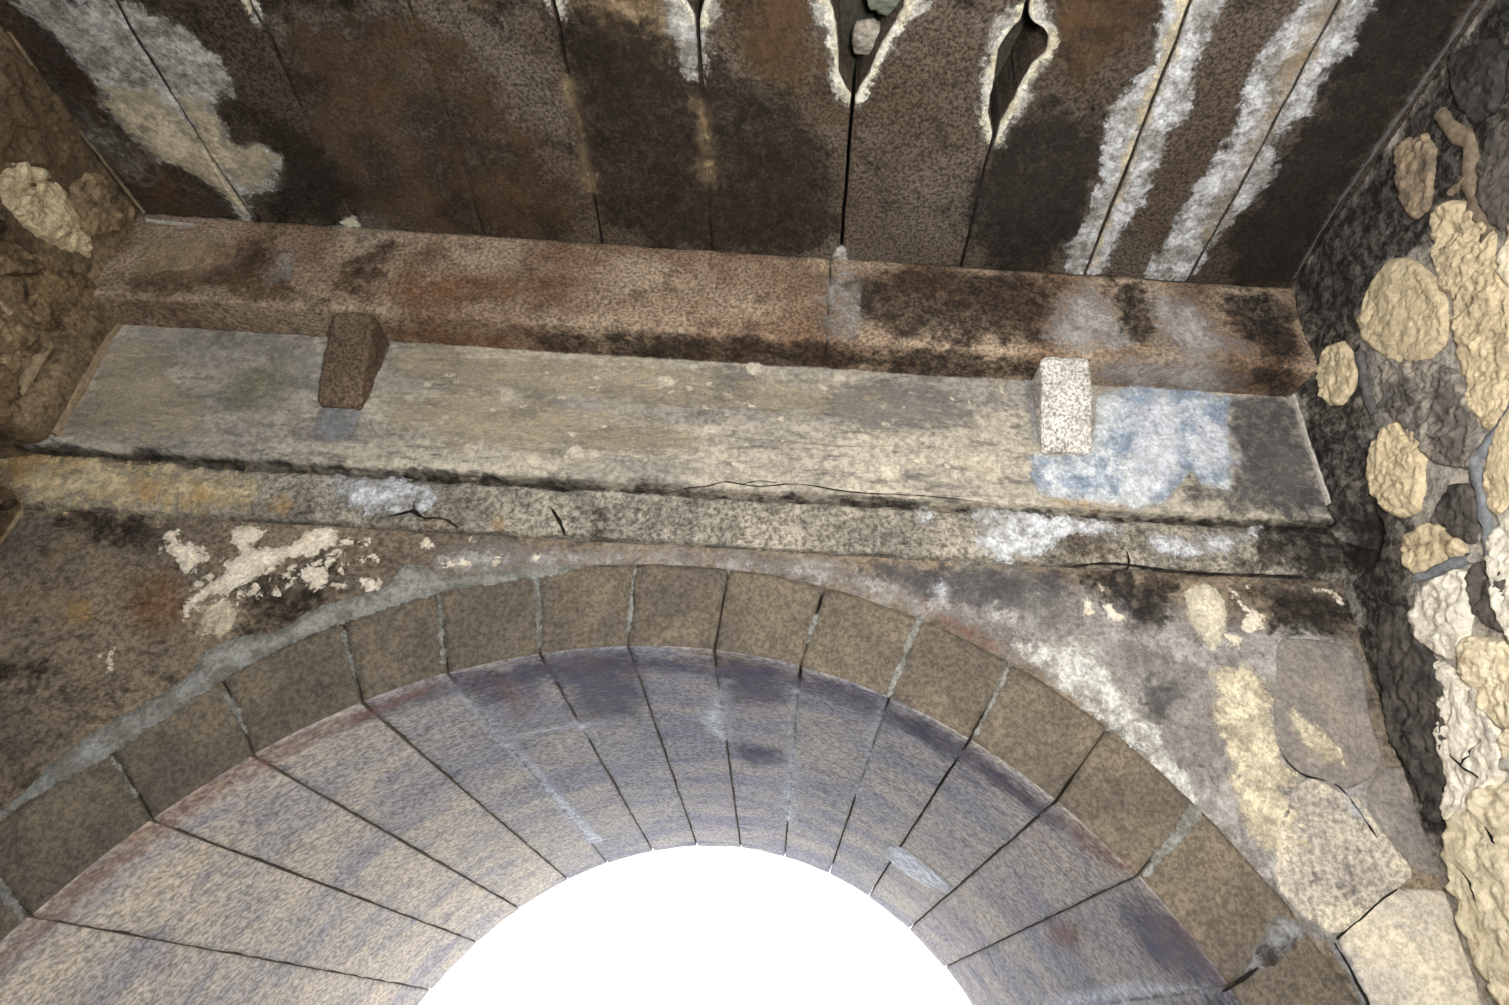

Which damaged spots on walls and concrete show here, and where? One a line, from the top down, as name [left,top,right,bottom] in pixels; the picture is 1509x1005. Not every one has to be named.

water stain [10,0,366,240]
spalling [810,0,932,106]
spalling [975,0,1061,146]
water stain [133,237,229,275]
water stain [0,332,258,570]
water stain [270,459,727,517]
water stain [364,0,1473,939]
water stain [238,555,345,635]
water stain [97,647,115,674]
crack [1449,739,1481,779]